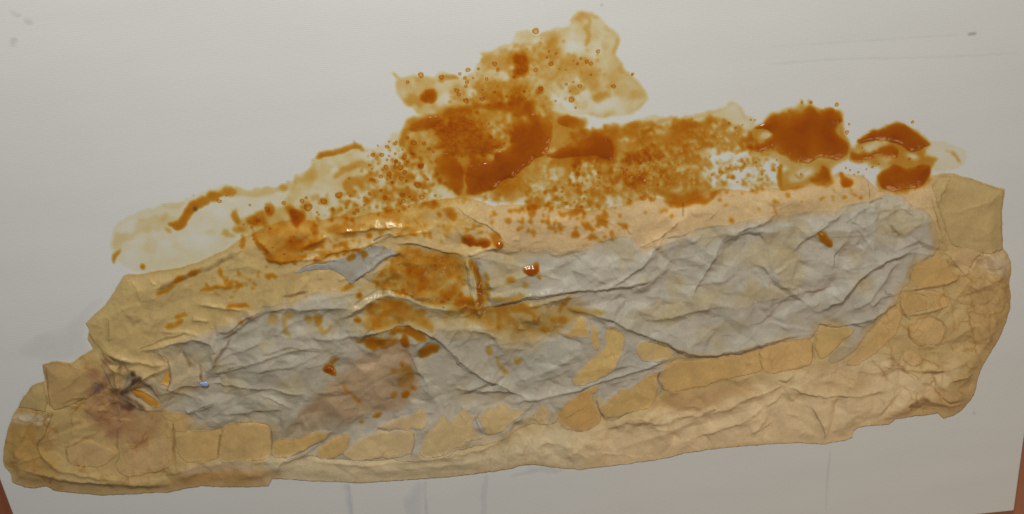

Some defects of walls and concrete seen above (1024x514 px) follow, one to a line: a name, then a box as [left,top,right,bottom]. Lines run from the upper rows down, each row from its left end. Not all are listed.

corrosion [463,236,502,247]